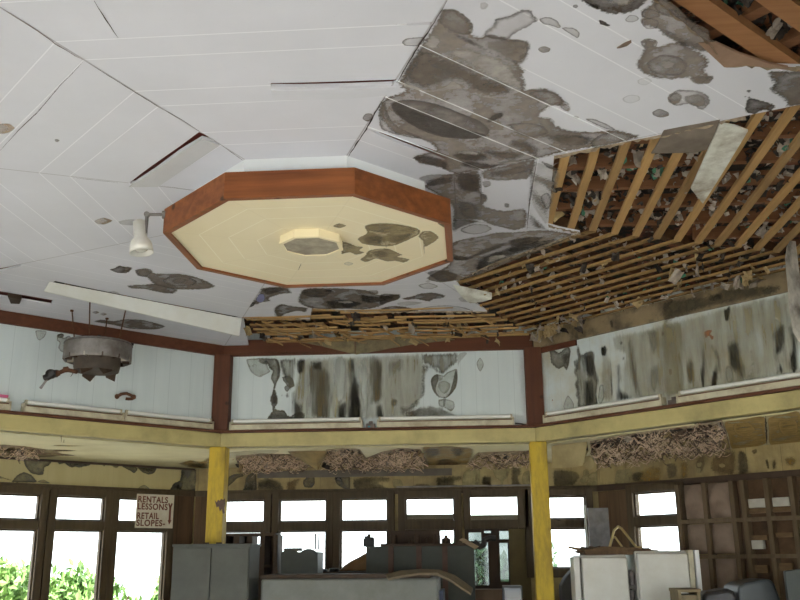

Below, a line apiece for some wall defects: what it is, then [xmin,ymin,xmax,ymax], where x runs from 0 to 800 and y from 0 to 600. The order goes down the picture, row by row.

leakage [573,0,714,117]
leakage [250,9,638,316]
peeling [552,171,581,193]
peeling [553,190,603,223]
peeling [632,144,693,225]
leakage [110,266,215,294]
peeling [652,241,775,291]
peeling [434,312,507,346]
peeling [529,289,586,343]
leakage [642,286,797,391]
leakage [247,353,458,419]
leakage [550,338,638,409]